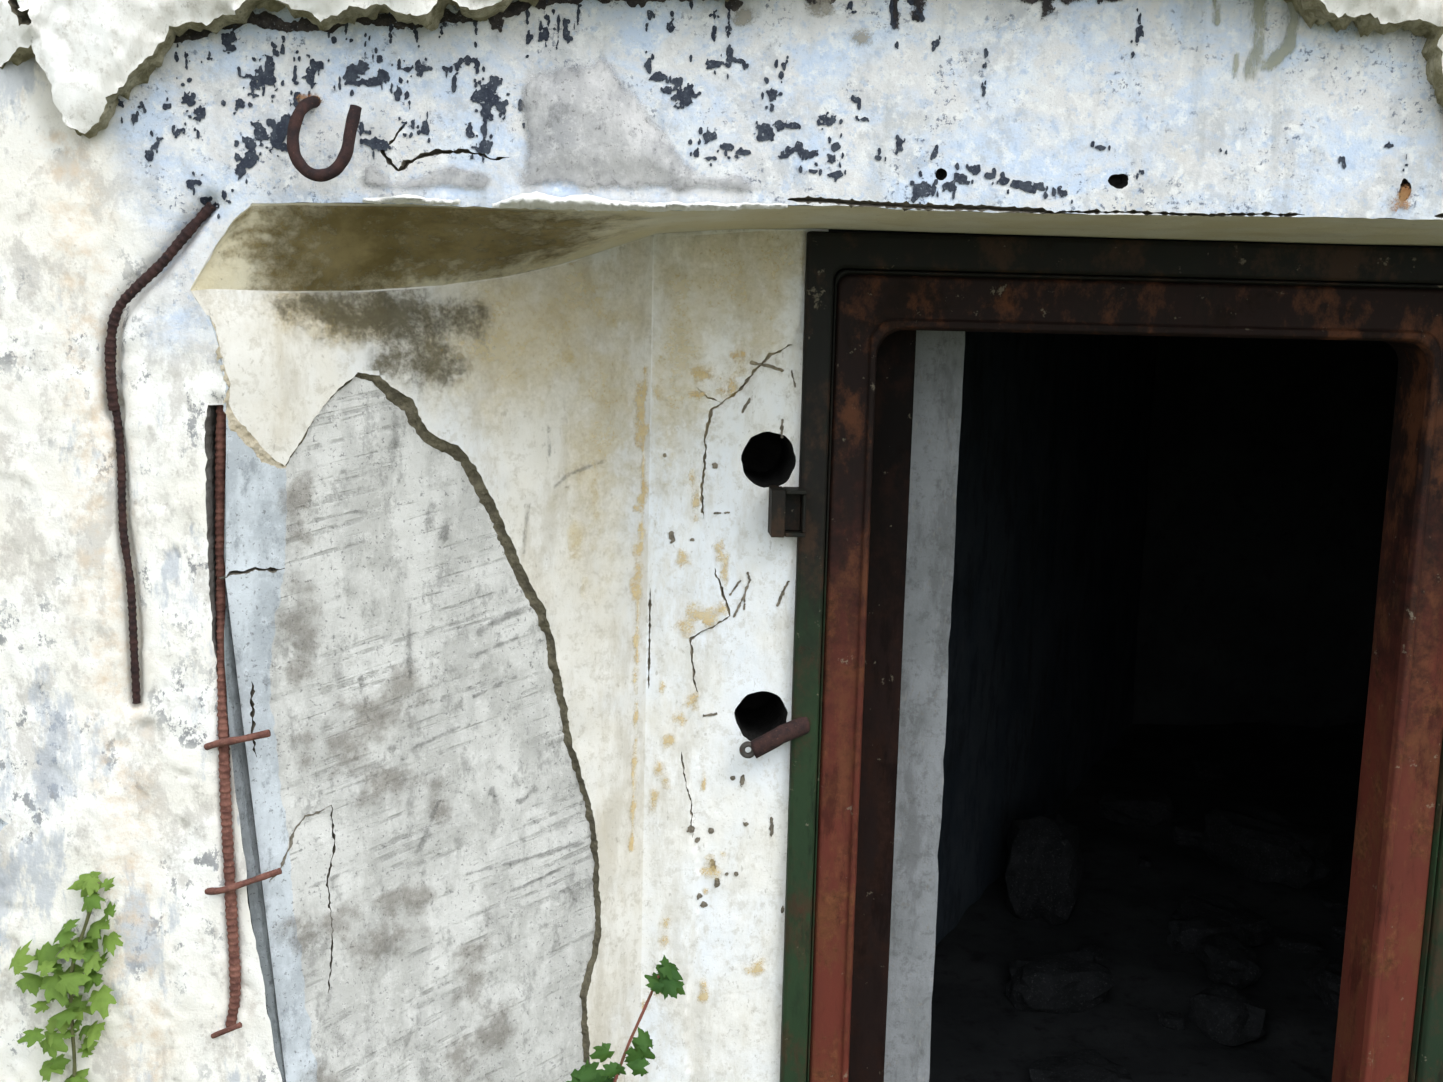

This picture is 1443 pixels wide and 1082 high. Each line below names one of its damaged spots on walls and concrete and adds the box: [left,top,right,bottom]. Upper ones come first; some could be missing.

peeling [889,0,925,49]
peeling [981,48,989,97]
peeling [1130,8,1144,58]
crack [380,124,509,171]
spalling [1384,142,1411,201]
crack [696,344,792,515]
crack [645,588,653,688]
crack [689,569,730,692]
flaking render [204,315,602,1082]
crack [681,752,693,838]
crack [269,805,336,993]